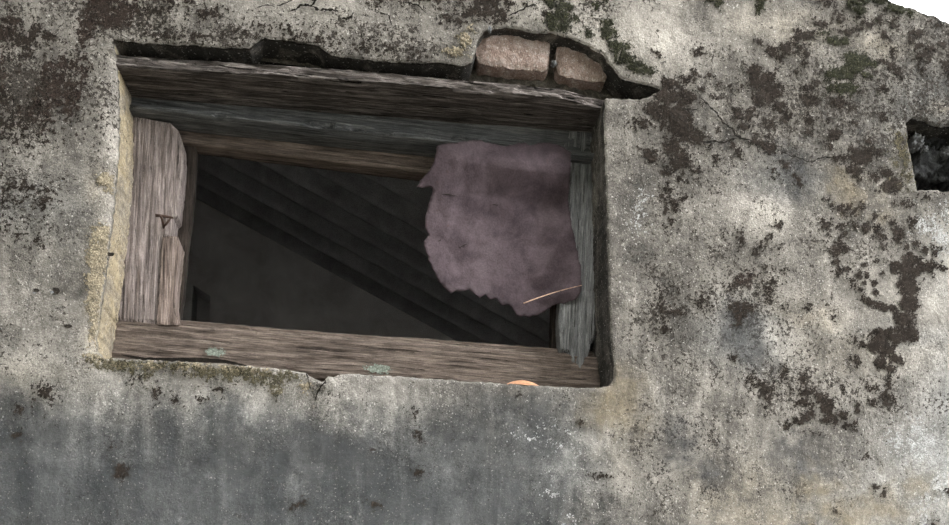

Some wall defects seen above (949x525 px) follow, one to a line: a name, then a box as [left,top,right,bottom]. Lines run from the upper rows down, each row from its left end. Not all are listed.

crack [257,0,426,25]
spalling [439,23,624,100]
crack [681,96,750,144]
crack [779,150,832,162]